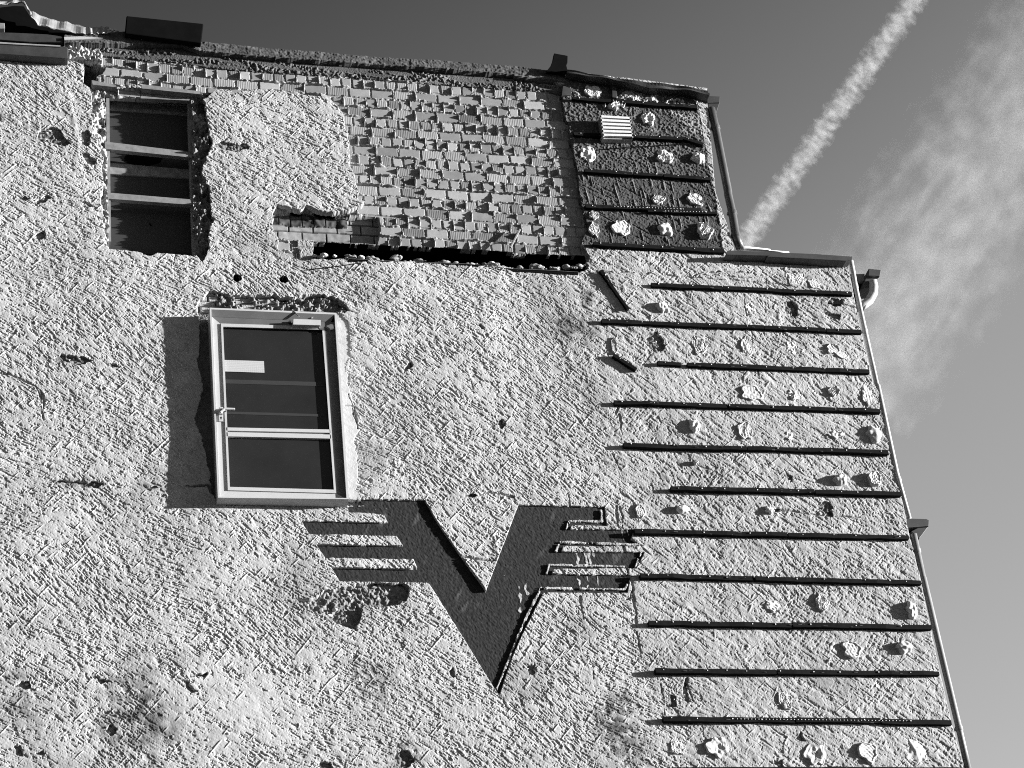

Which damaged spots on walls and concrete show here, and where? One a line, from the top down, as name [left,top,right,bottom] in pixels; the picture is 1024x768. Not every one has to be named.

spalling [193,293,346,498]
spalling [298,584,408,631]